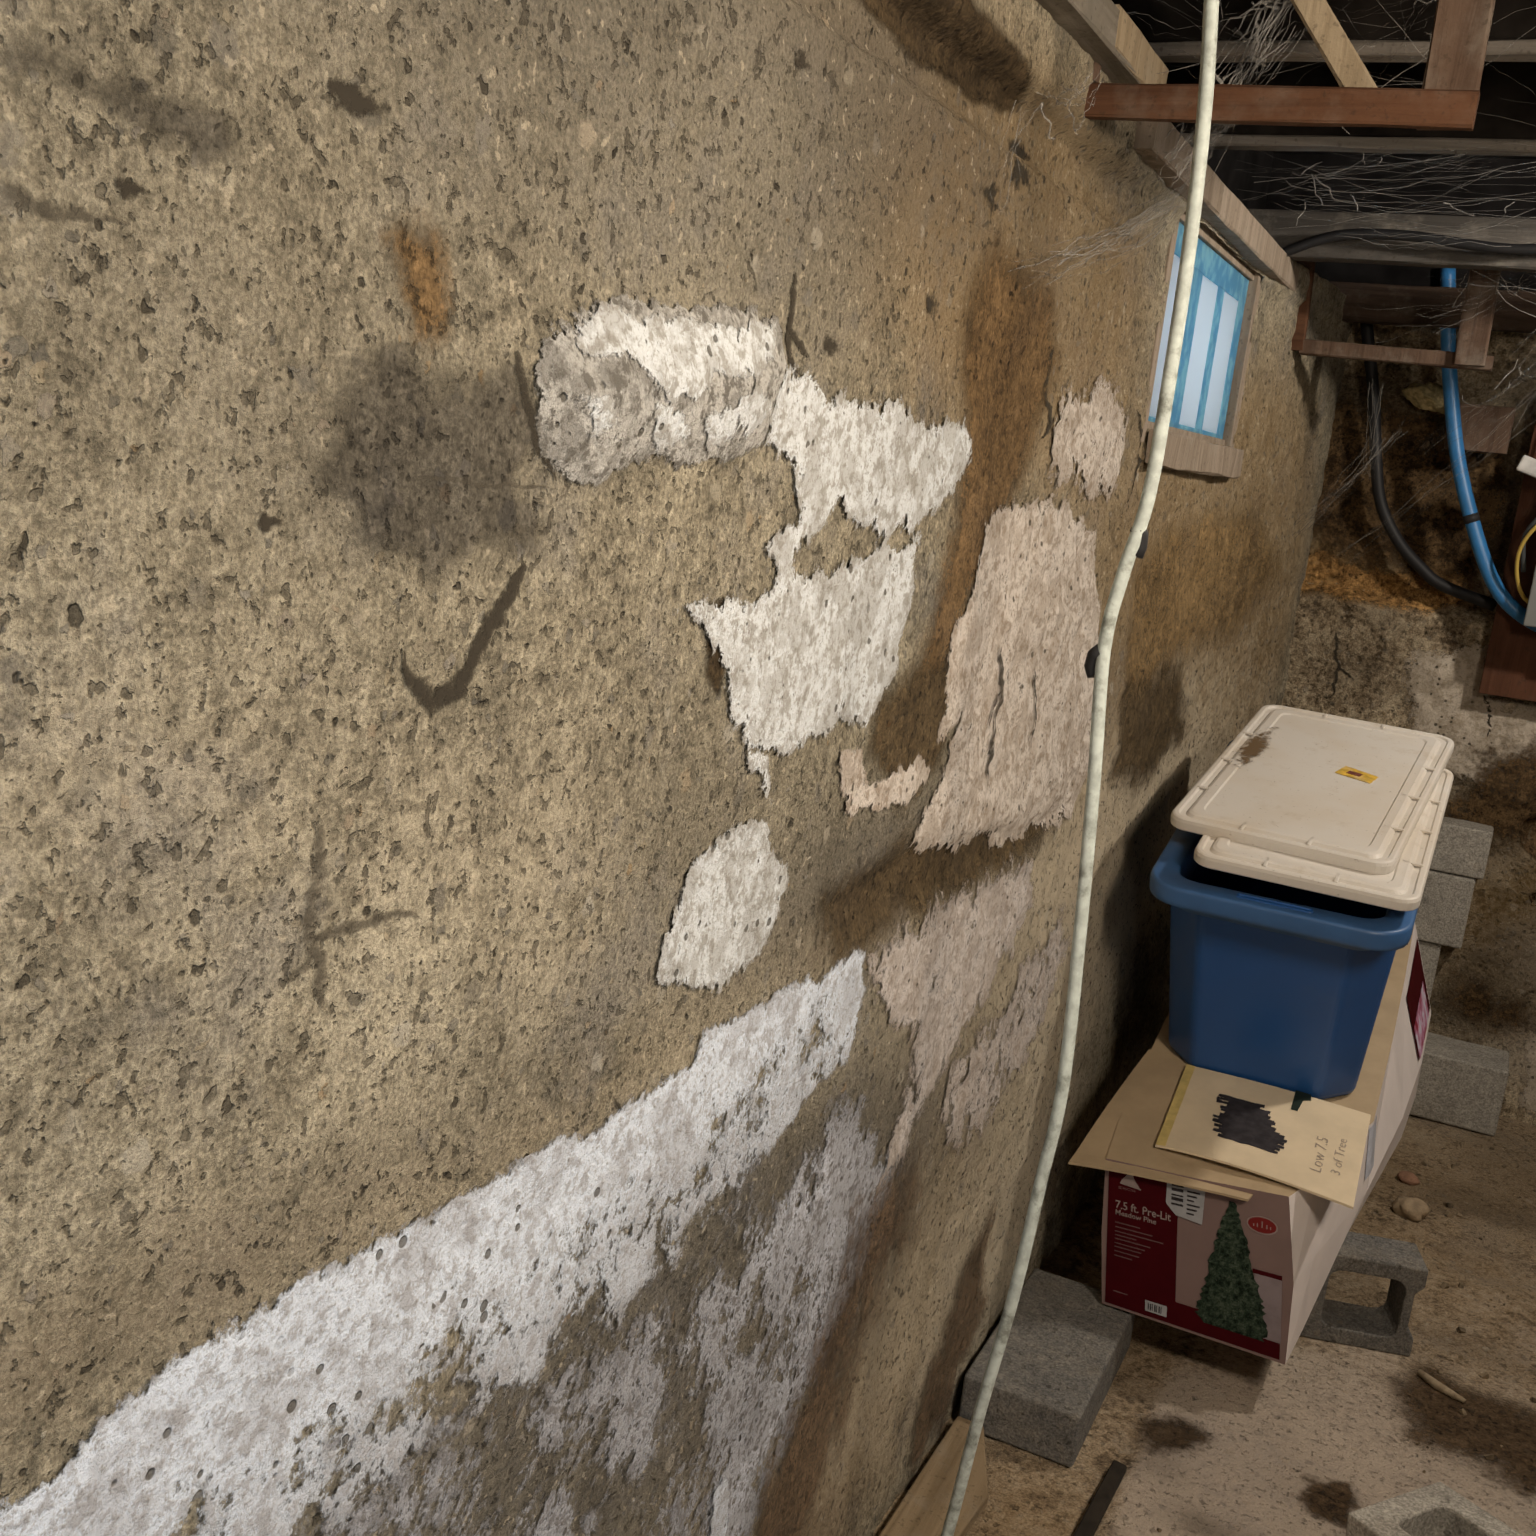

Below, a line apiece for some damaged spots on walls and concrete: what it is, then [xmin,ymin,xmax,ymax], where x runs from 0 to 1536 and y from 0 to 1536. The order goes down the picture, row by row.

leakage [863,0,1032,112]
crack [6,184,131,226]
corrosion [394,228,451,336]
leakage [318,345,539,575]
leakage [707,638,726,692]
peeling [656,355,1129,999]
leakage [300,805,1070,1536]